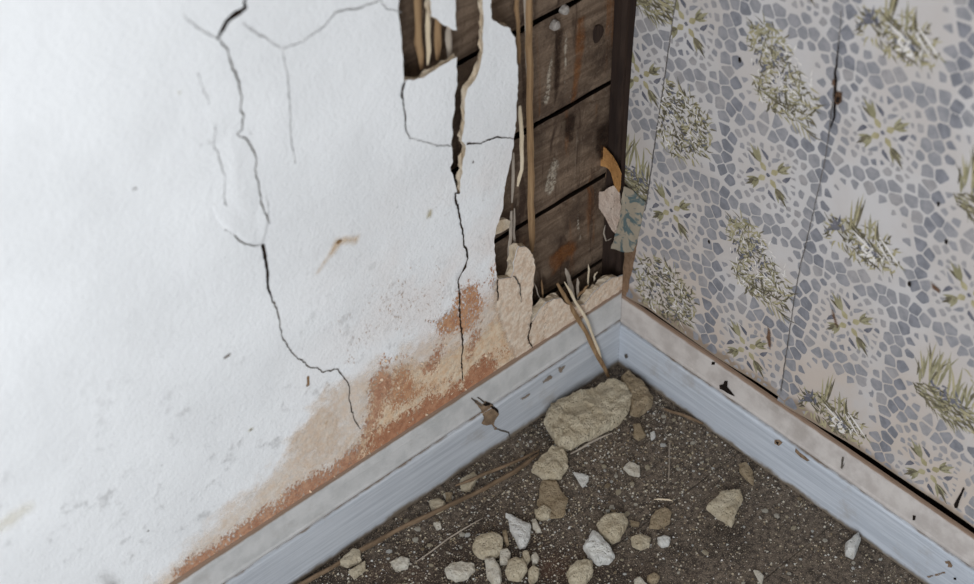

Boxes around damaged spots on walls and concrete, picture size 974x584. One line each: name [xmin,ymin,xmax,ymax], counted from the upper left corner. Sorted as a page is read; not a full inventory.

crack [182,0,400,429]
water stain [162,302,515,584]
flaking render [171,243,623,580]
crack [401,81,512,147]
crack [454,192,468,381]
flaking render [450,0,517,192]